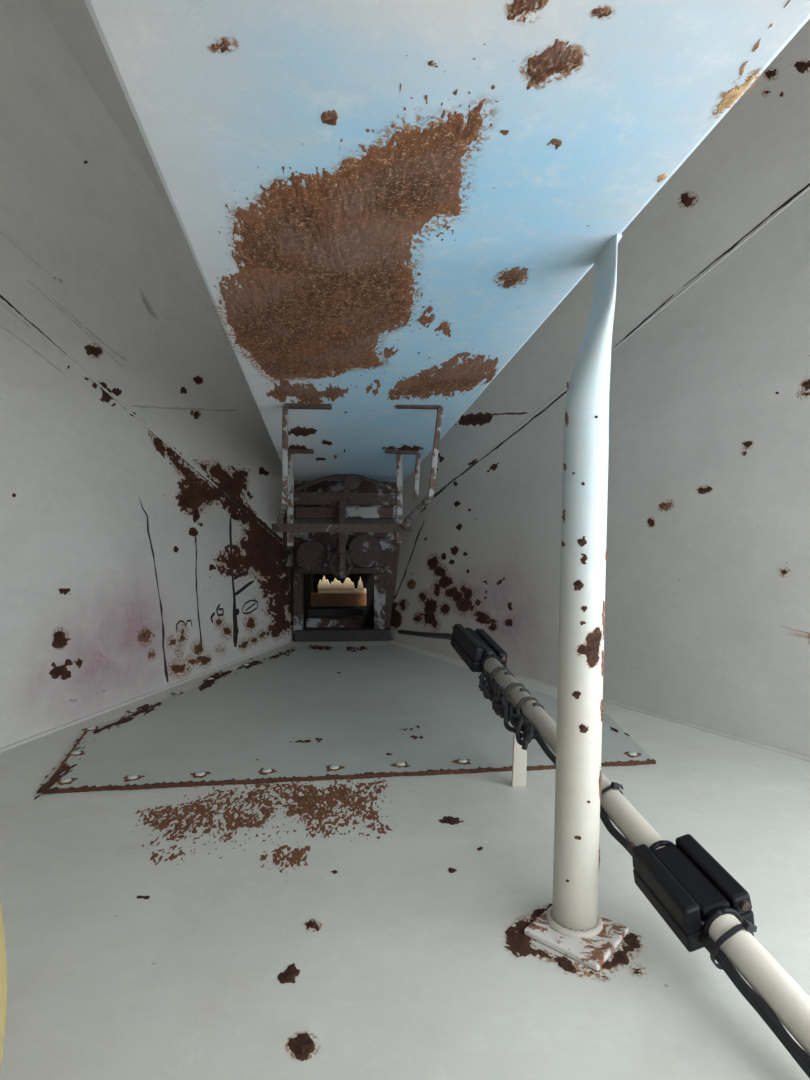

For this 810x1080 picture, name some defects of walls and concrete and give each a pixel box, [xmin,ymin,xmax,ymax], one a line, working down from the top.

corrosion [507,0,548,23]
corrosion [513,39,587,90]
corrosion [207,84,510,404]
corrosion [496,266,528,289]
corrosion [148,433,296,691]
corrosion [390,546,513,631]
corrosion [49,627,83,680]
corrosion [577,601,605,675]
corrosion [34,702,512,874]
corrosion [587,751,656,803]
corrosion [504,903,644,980]
corrosion [286,1032,318,1061]